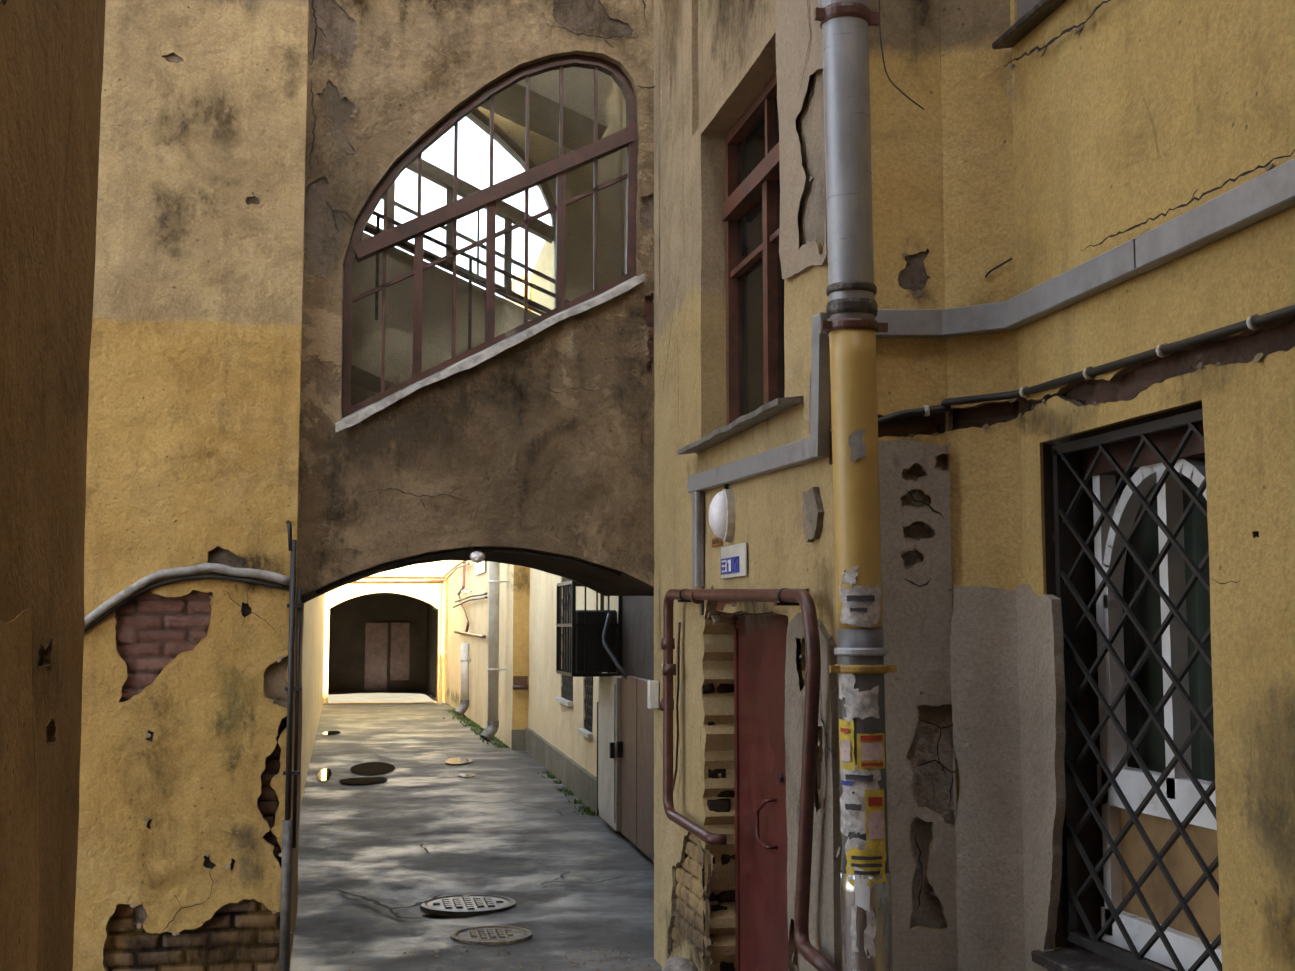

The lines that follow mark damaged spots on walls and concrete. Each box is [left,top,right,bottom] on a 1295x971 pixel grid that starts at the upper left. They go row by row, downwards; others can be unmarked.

crack [1004,0,1111,69]
peeling [801,70,826,247]
crack [1082,149,1295,251]
spalling [898,249,931,298]
spalling [207,546,247,568]
flaking render [115,590,213,702]
flaking render [878,315,1295,971]
flaking render [257,656,288,868]
flaking render [702,769,735,812]
damp [1248,695,1295,880]
flaking render [103,899,293,971]
flaking render [667,832,736,971]